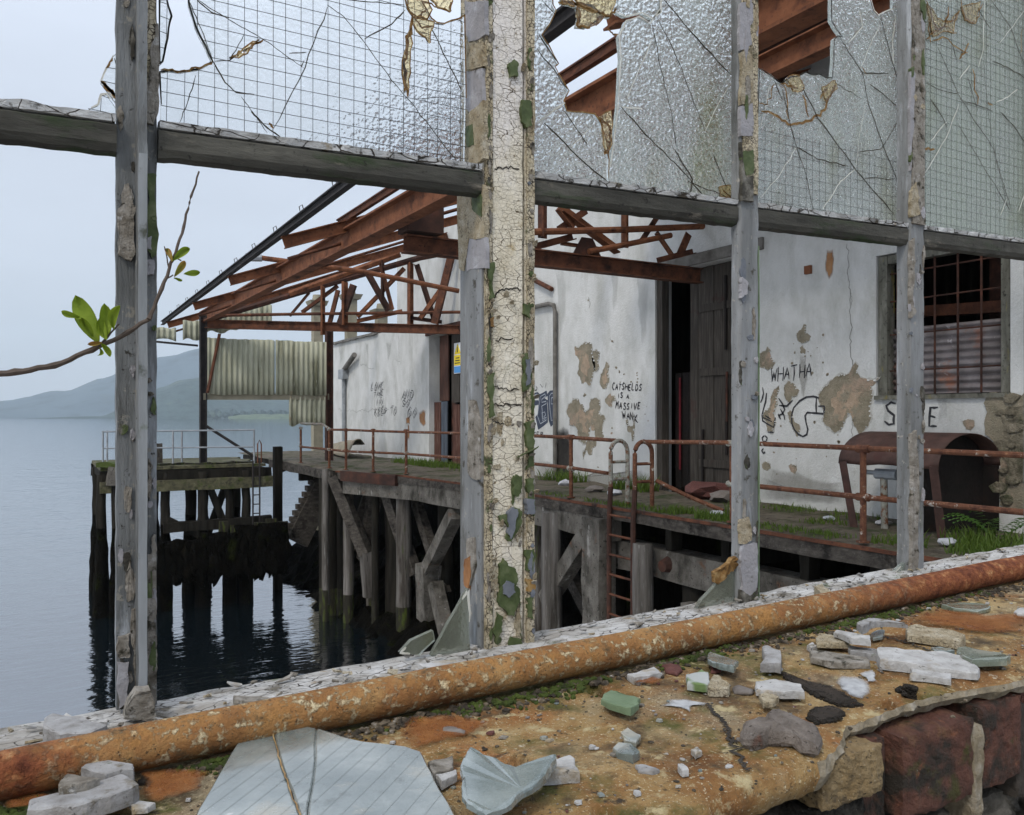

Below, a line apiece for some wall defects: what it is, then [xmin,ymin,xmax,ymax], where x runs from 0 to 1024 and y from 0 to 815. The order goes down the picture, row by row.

crack [180,0,463,161]
crack [537,35,607,181]
crack [621,0,731,194]
crack [760,11,897,214]
peeling [116,162,155,275]
peeling [565,341,638,459]
peeling [791,324,880,444]
peeling [626,380,1024,631]
corrosion [922,610,1024,631]
corrosion [9,793,46,807]
corrosion [145,770,200,799]
corrosion [407,717,480,745]